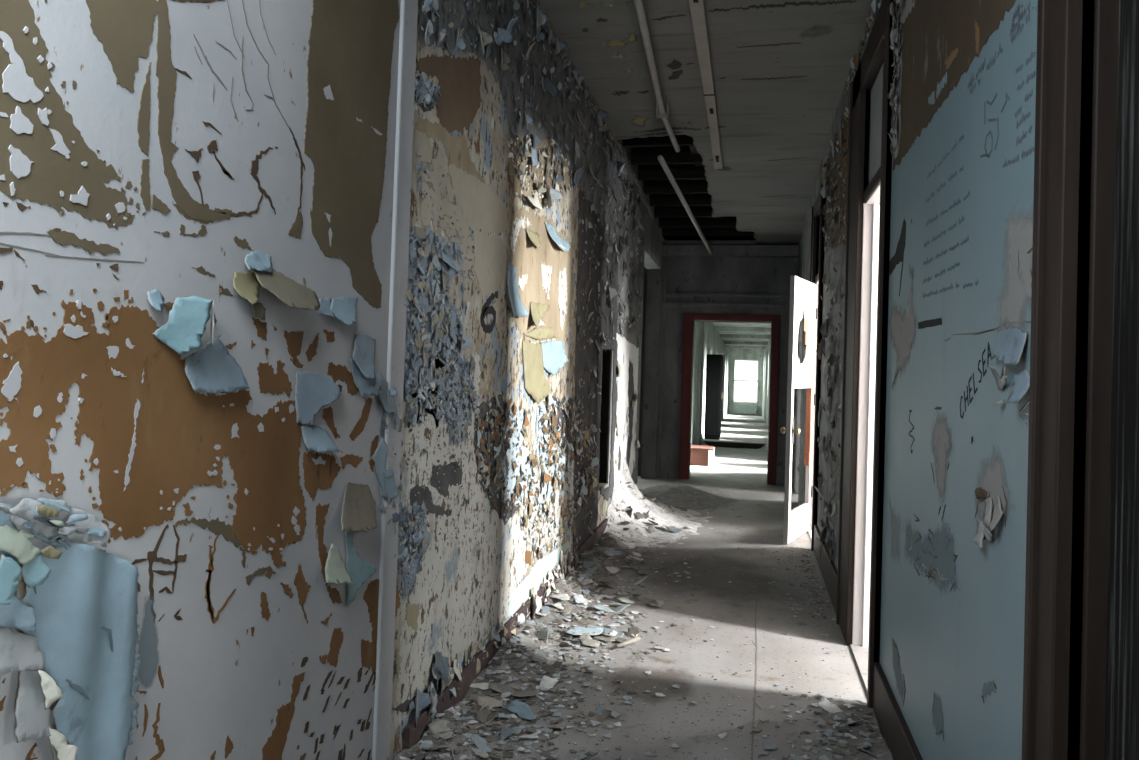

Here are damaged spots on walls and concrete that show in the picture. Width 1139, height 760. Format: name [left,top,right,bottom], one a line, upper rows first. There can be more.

peeling [0,0,693,760]